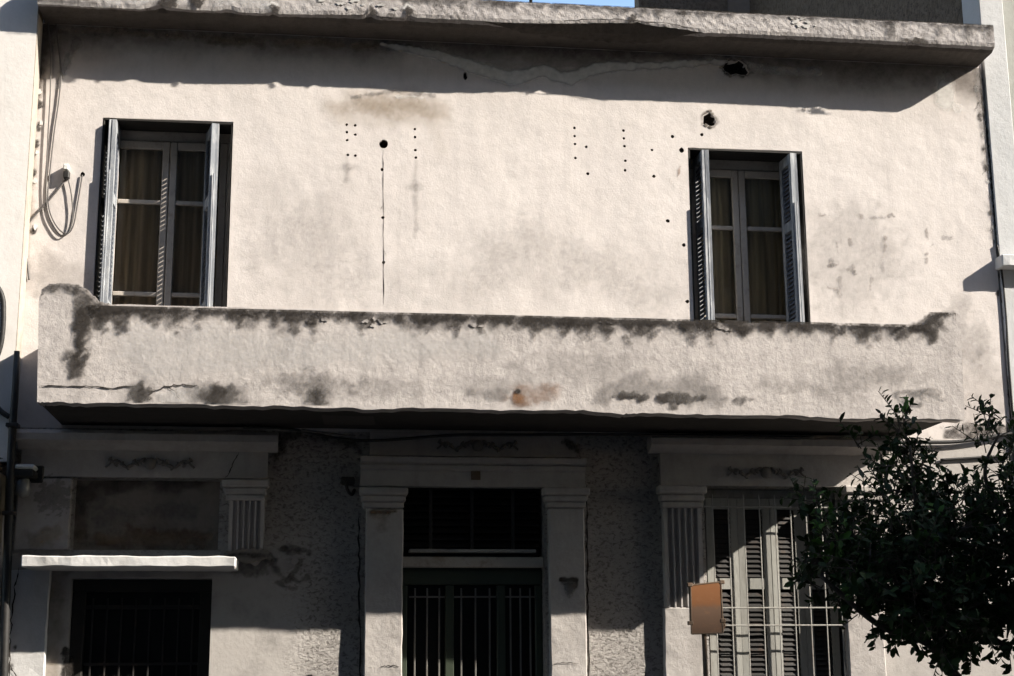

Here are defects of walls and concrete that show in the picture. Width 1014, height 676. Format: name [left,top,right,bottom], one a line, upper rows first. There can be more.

crack [379,199,387,305]
damp [41,283,956,379]
crack [44,384,197,402]
damp [130,380,155,402]
damp [194,383,246,403]
damp [309,388,329,404]
corrosion [513,389,524,405]
spalling [225,547,310,585]
spalling [559,577,578,595]